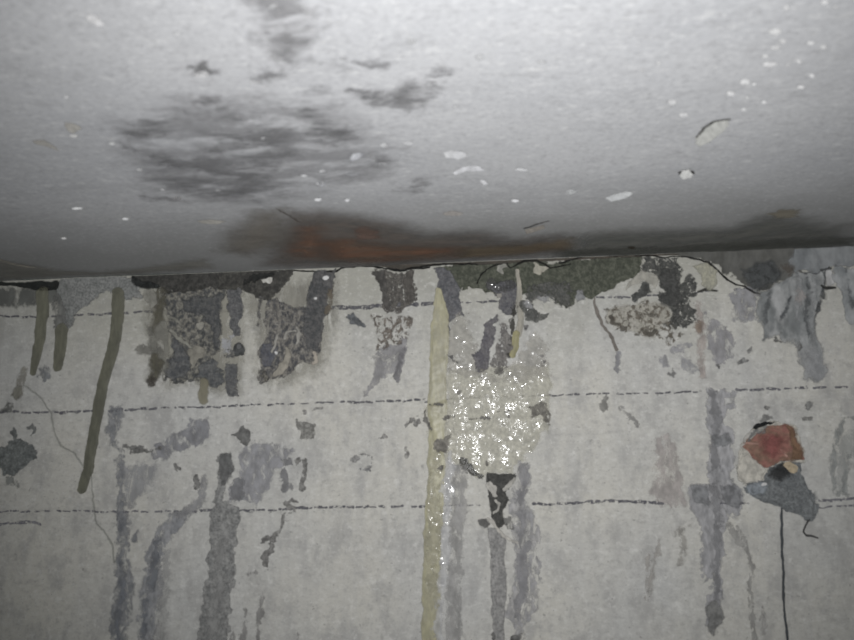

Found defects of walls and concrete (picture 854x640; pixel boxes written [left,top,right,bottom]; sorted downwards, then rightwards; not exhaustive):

water stain [158,130,291,193]
spalling [695,119,731,146]
corrosion [233,209,568,266]
crack [277,257,583,284]
crack [614,255,760,294]
water stain [1,287,69,412]
spalling [131,268,336,404]
spalling [364,268,418,397]
water stain [77,287,308,640]
water stain [404,269,552,640]
spalling [737,414,805,486]